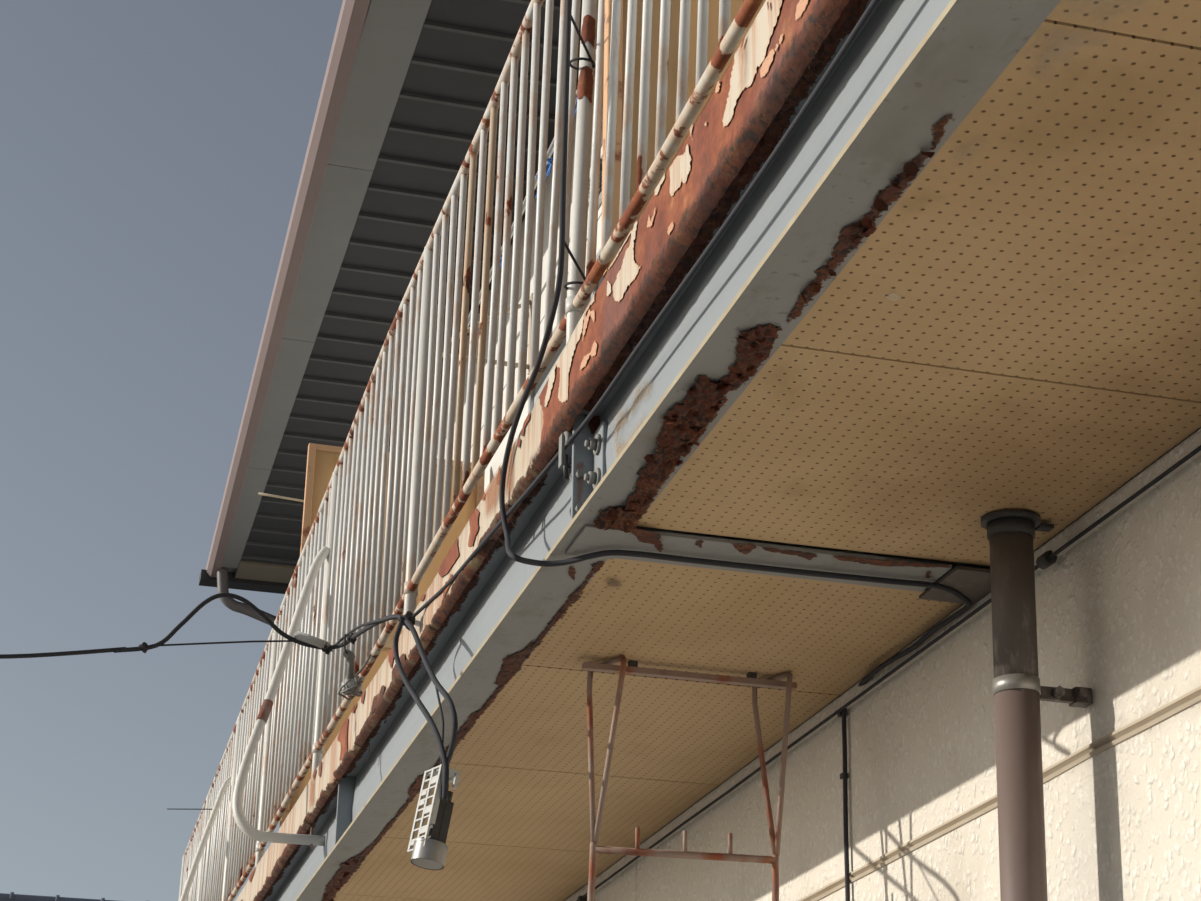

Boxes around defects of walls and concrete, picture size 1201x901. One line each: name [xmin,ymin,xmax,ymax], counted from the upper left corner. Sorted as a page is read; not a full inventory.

rust [241,0,850,901]
peeling [538,0,817,454]
rust [852,199,888,246]
rust [890,150,935,189]